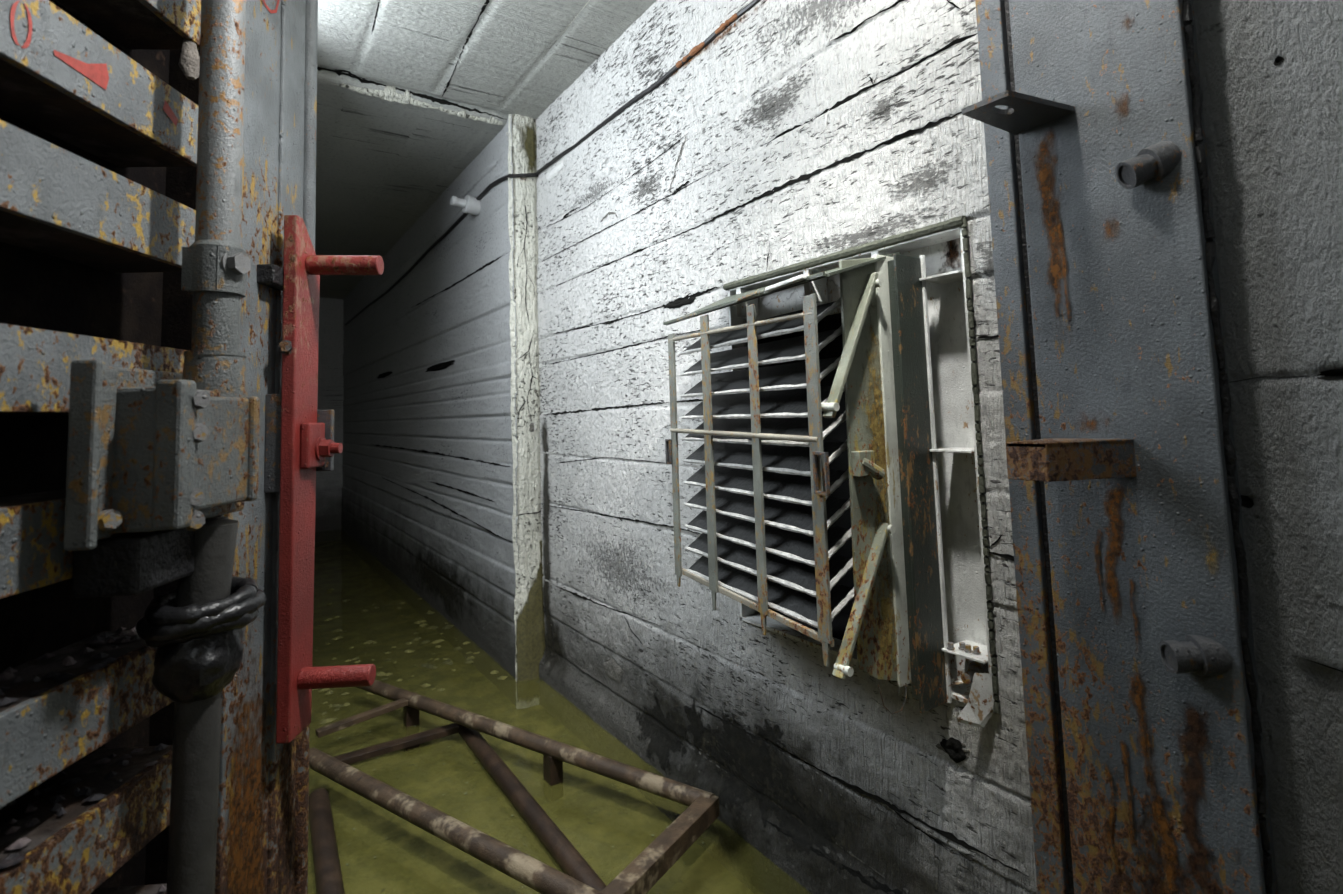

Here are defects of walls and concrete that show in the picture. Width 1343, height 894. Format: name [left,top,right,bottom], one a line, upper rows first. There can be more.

rust [671,8,757,76]
crack [764,0,978,145]
crack [413,112,962,422]
rust [1034,130,1070,341]
rust [864,305,896,662]
rust [1094,487,1138,643]
water stain [637,681,941,894]
rust [1106,675,1218,894]